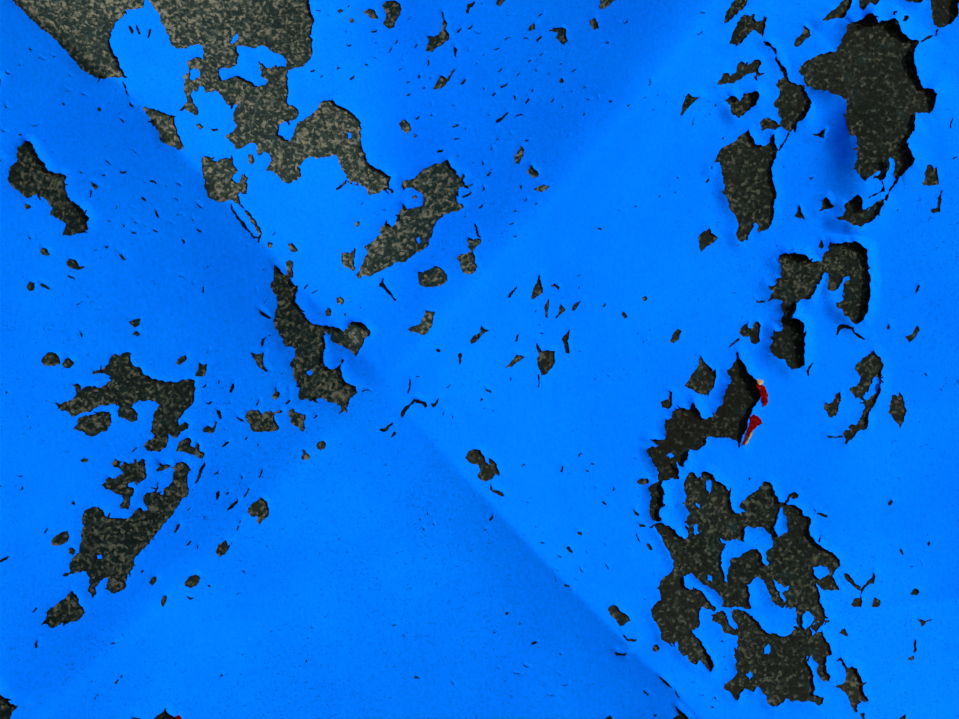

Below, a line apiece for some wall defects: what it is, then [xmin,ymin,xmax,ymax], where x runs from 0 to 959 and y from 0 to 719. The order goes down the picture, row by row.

peeling [0,0,473,278]
peeling [711,0,959,242]
peeling [245,243,370,432]
peeling [739,240,871,369]
peeling [41,352,207,628]
peeling [637,352,869,719]
peeling [0,694,18,719]
peeling [154,708,182,719]